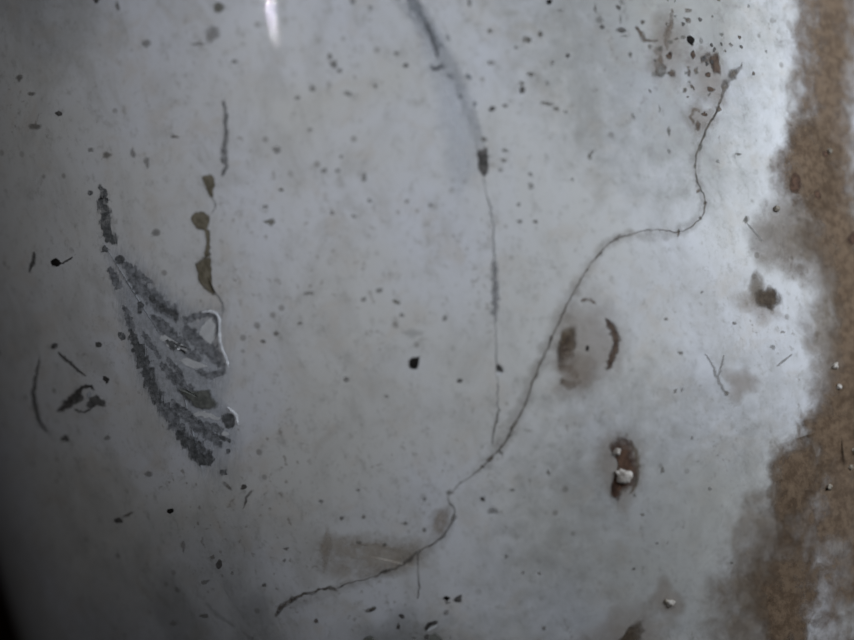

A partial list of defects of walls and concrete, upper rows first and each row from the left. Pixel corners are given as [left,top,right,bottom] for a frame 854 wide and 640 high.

crack [277,64,742,614]
rust [558,329,581,388]
rust [606,319,620,369]